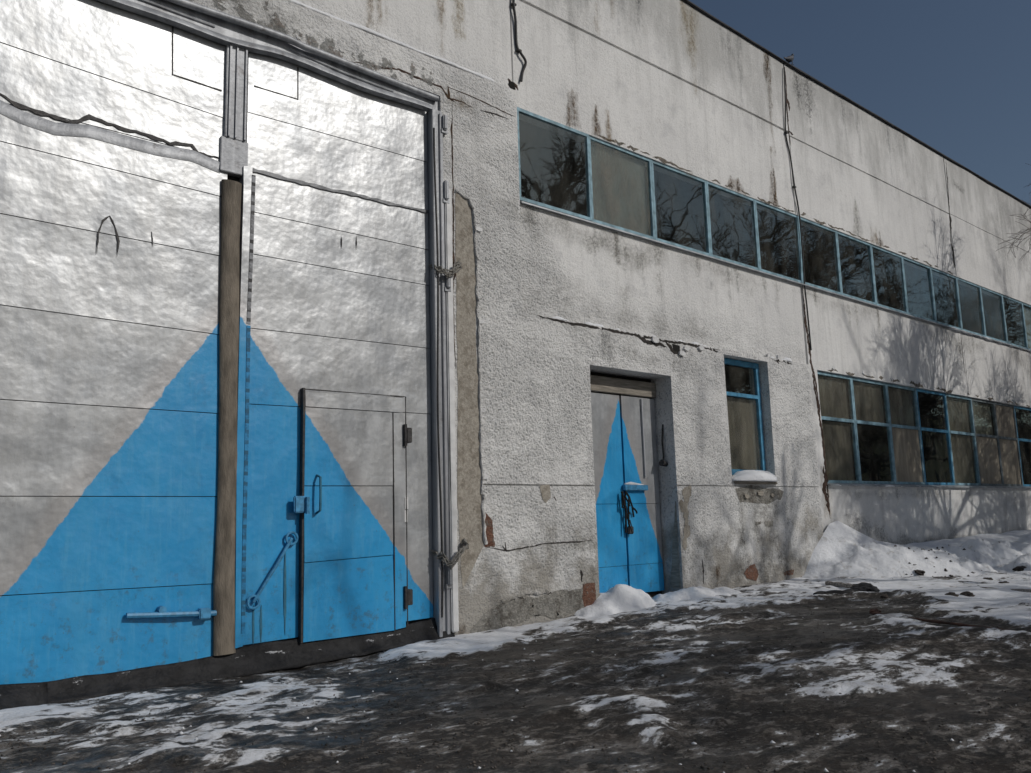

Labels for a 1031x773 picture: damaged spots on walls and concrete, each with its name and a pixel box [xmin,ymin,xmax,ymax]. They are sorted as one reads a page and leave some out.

peeling [214,0,438,86]
crack [785,72,793,144]
crack [946,167,955,268]
flaking render [455,188,495,587]
crack [802,285,830,515]
spalling [736,485,784,504]
flaking render [470,570,596,633]